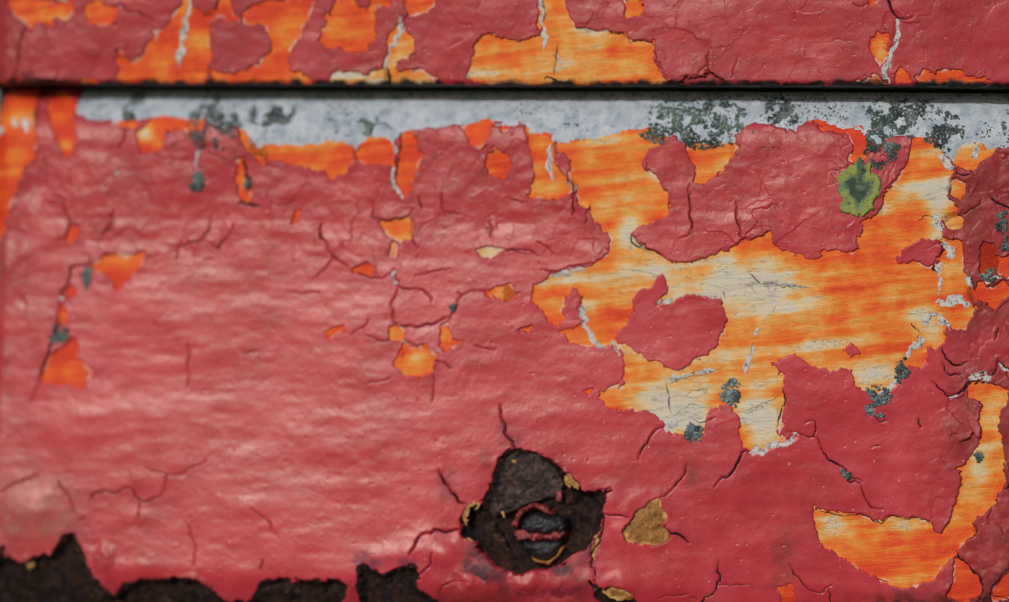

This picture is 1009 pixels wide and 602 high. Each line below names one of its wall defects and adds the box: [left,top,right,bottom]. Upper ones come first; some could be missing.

peeling [116,0,315,84]
peeling [319,0,437,84]
peeling [465,0,667,85]
peeling [235,129,424,202]
crack [356,121,456,248]
crack [545,141,574,215]
crack [29,146,262,402]
crack [288,224,485,400]
crack [578,304,620,356]
peeling [525,126,1009,453]
peeling [813,381,1009,602]
corrosion [465,545,502,581]